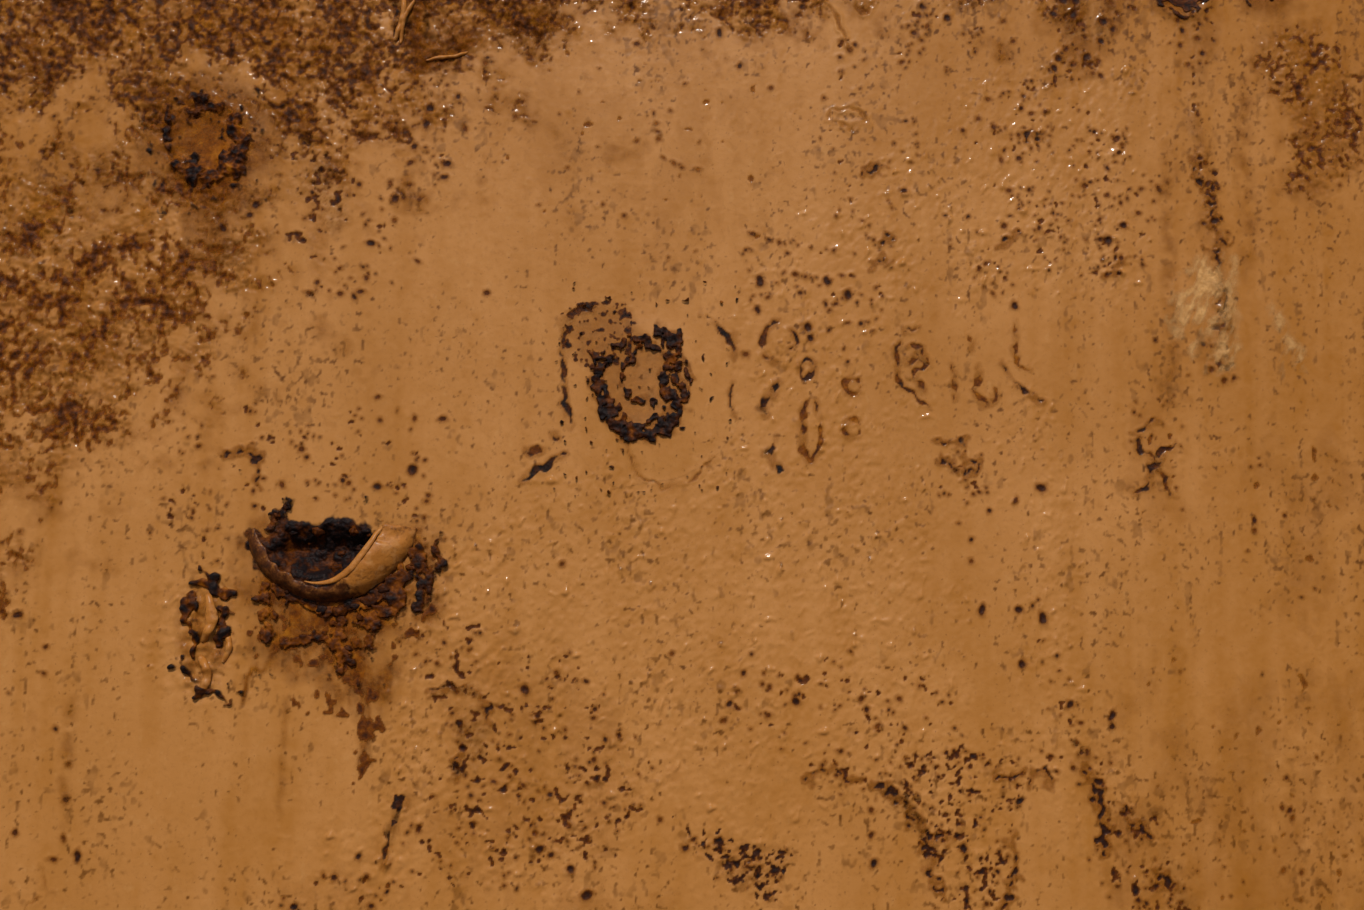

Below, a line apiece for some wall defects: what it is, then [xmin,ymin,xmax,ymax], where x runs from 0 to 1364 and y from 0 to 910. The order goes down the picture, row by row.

rust [618,0,655,33]
rust [679,0,824,39]
rust [0,0,603,499]
rust [555,282,714,452]
rust [894,327,929,406]
rust [951,365,998,407]
rust [935,436,988,504]
rust [0,533,33,571]
rust [0,581,18,620]
spalling [163,403,643,891]
spalling [720,671,746,723]
spalling [682,827,793,910]